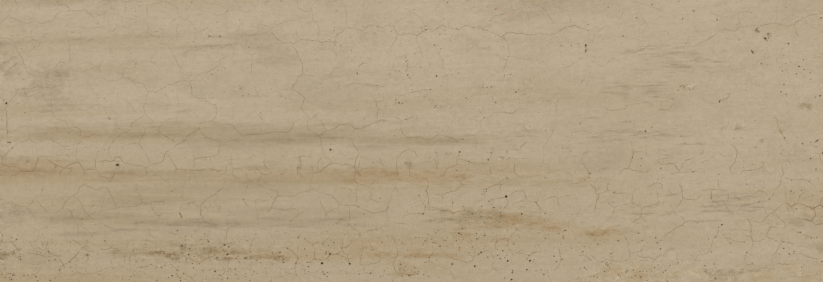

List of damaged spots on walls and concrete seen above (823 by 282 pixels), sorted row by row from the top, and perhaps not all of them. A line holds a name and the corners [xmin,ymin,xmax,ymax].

crack [1,104,252,268]